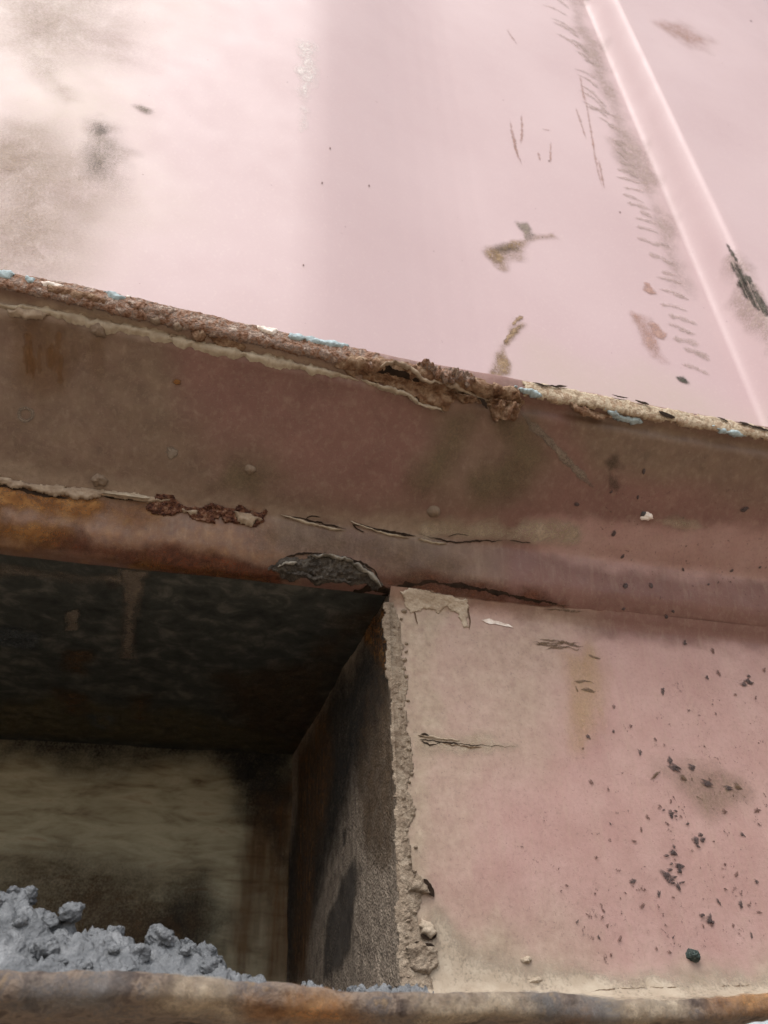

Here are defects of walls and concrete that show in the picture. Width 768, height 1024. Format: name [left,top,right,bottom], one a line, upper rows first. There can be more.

leakage [553,1,707,373]
corrosion [0,269,380,369]
corrosion [417,359,768,441]
corrosion [0,484,280,584]
crack [281,514,530,545]
peeling [400,588,471,629]
crack [353,580,558,604]
crack [418,733,509,749]
leakage [324,862,357,978]